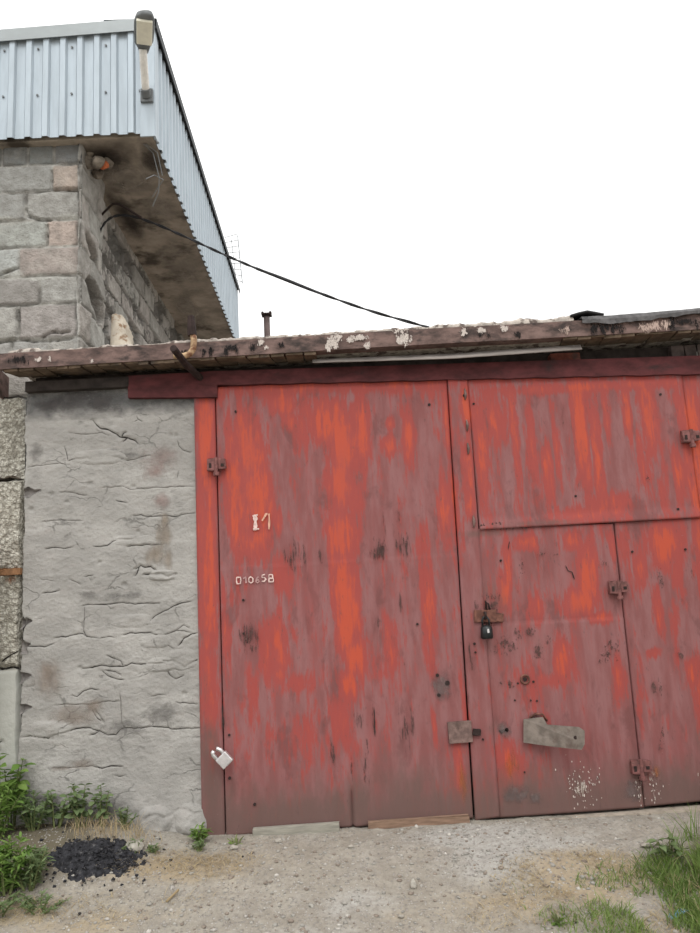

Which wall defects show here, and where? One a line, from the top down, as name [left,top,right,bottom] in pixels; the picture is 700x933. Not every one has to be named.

peeling [325,333,371,352]
peeling [394,328,412,346]
peeling [638,319,670,333]
crack [30,416,149,467]
crack [109,475,193,517]
crack [95,540,160,575]
crack [0,602,196,735]